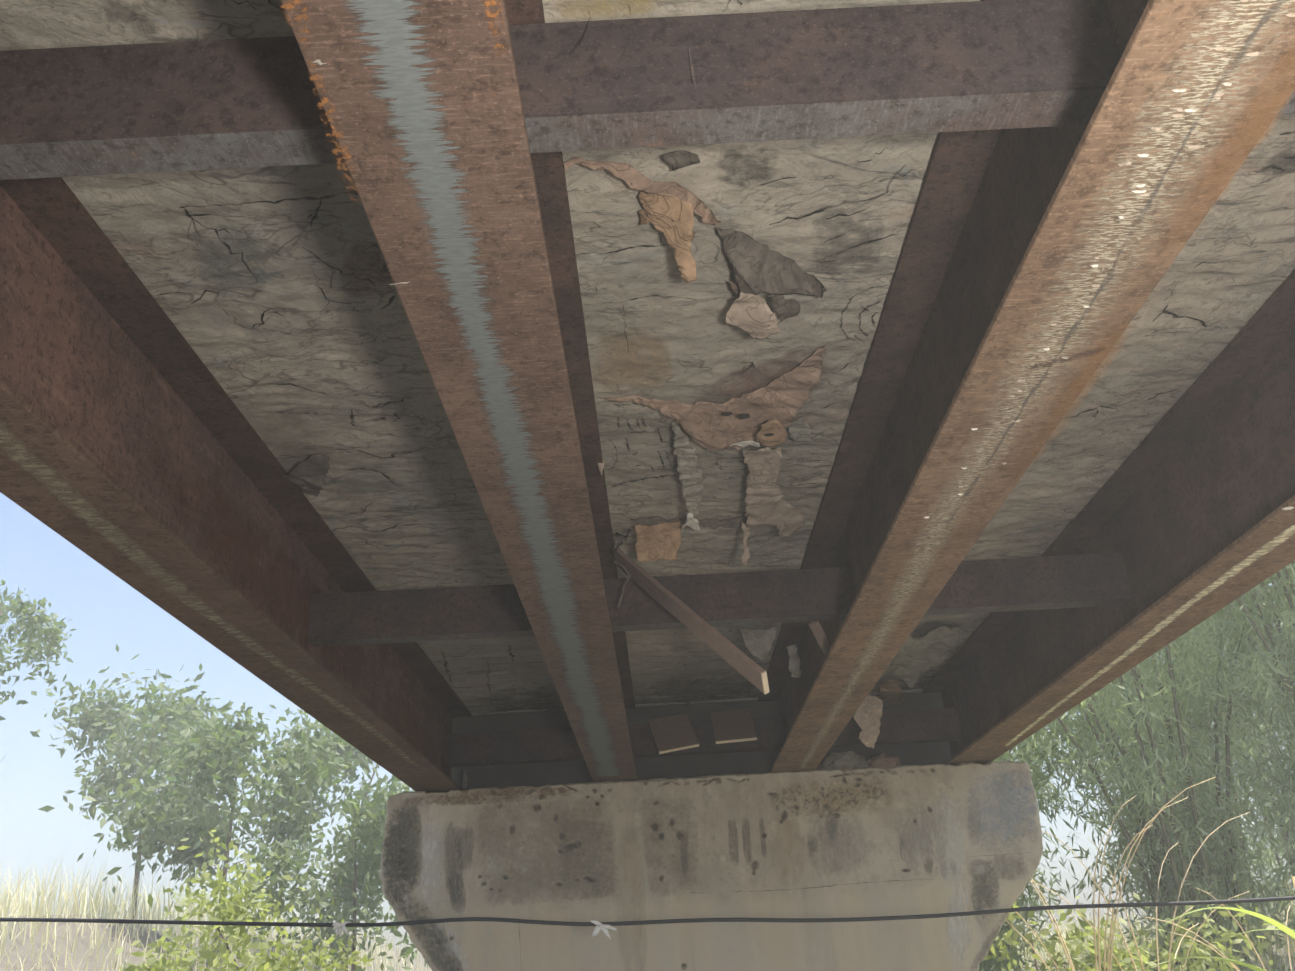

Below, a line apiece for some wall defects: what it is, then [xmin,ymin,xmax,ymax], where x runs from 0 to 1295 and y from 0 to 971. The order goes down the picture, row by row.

corrosion [310,63,351,179]
crack [156,290,283,327]
crack [180,183,396,309]
leakage [384,807,467,971]